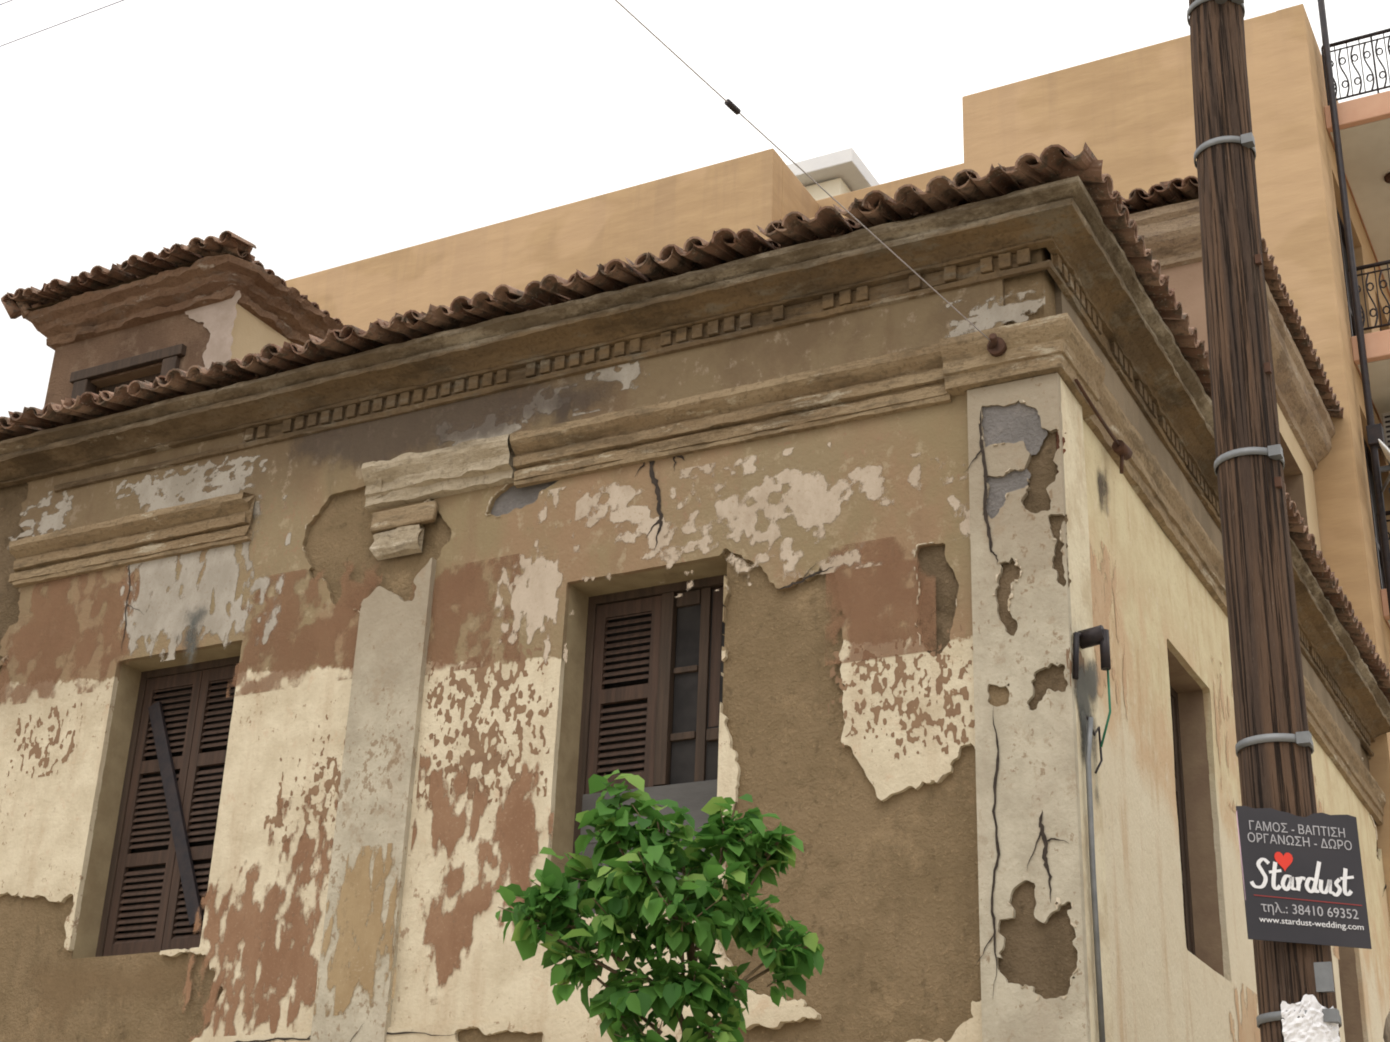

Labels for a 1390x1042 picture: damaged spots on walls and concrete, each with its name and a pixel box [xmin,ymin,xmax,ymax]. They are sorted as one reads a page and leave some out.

peeling [116,456,268,516]
crack [636,455,684,548]
crack [966,408,998,562]
flaking render [992,559,1023,636]
flaking render [1050,514,1071,588]
peeling [1029,540,1128,720]
peeling [0,483,571,986]
flaking render [485,447,981,1042]
flaking render [0,715,401,1042]
crack [974,718,1068,993]
flaking render [998,881,1079,1001]
flaking render [458,1026,544,1042]